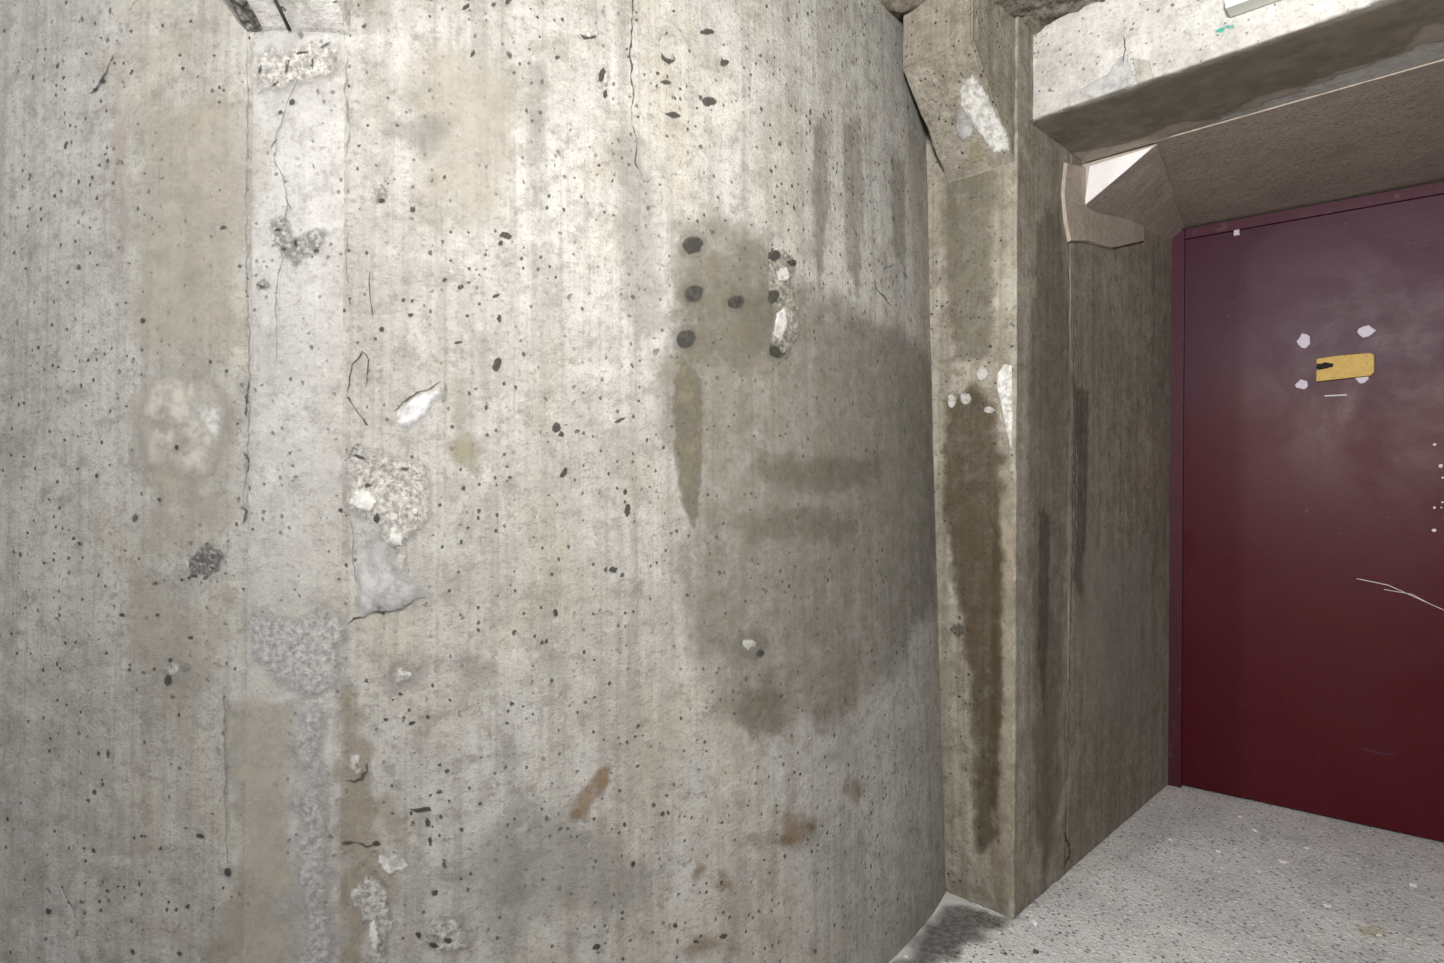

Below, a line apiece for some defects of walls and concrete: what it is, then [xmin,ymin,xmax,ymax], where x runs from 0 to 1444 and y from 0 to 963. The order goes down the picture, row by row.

spalling [271,217,323,266]
spalling [768,250,799,353]
water stain [674,362,702,520]
spalling [338,448,430,546]
spalling [186,547,223,580]
water stain [945,388,1015,901]
corrosion [573,769,608,818]
spalling [350,854,408,963]